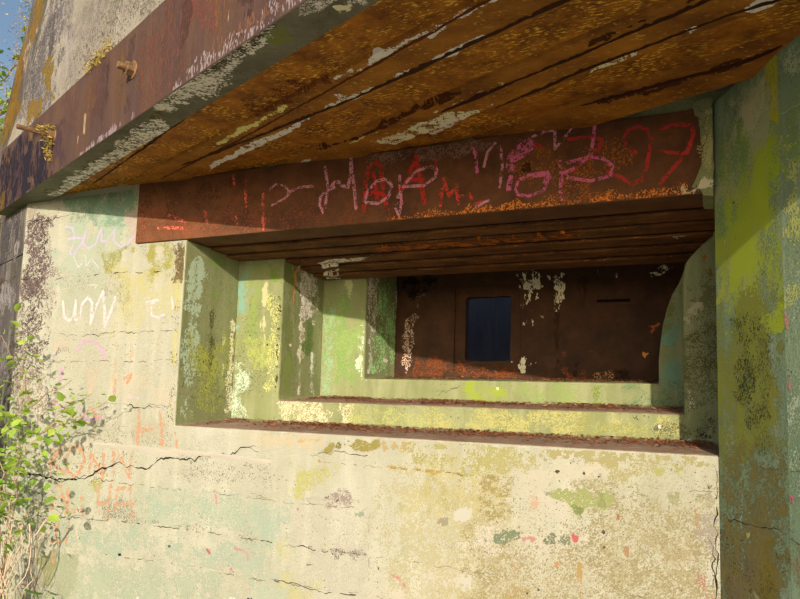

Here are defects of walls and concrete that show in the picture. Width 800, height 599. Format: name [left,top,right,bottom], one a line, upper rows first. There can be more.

corrosion [0,119,66,208]
water stain [14,0,162,132]
water stain [42,0,373,210]
corrosion [316,91,462,150]
water stain [333,24,446,80]
corrosion [136,136,689,242]
water stain [350,100,480,145]
water stain [395,275,437,373]
corrosion [411,351,517,379]
peeling [516,272,565,312]
crack [4,446,257,491]
crack [655,471,800,599]